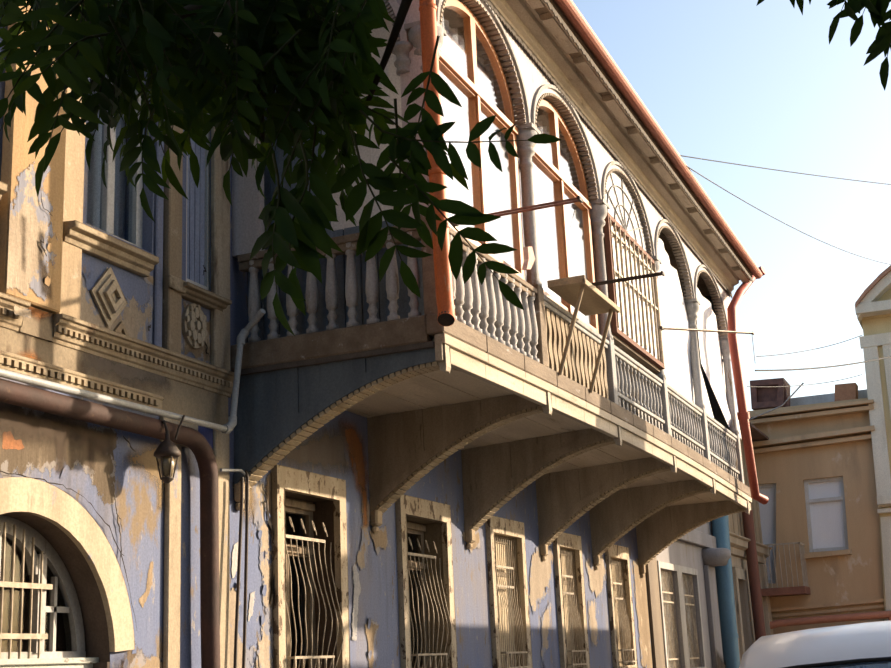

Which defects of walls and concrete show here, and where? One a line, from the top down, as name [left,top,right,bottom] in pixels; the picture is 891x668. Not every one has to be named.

peeling [7,161,58,301]
spalling [14,305,31,319]
damp [0,407,112,472]
rust [343,424,368,526]
peeling [139,561,154,607]
peeling [230,472,273,668]
peeling [351,498,388,668]
peeling [528,544,553,662]